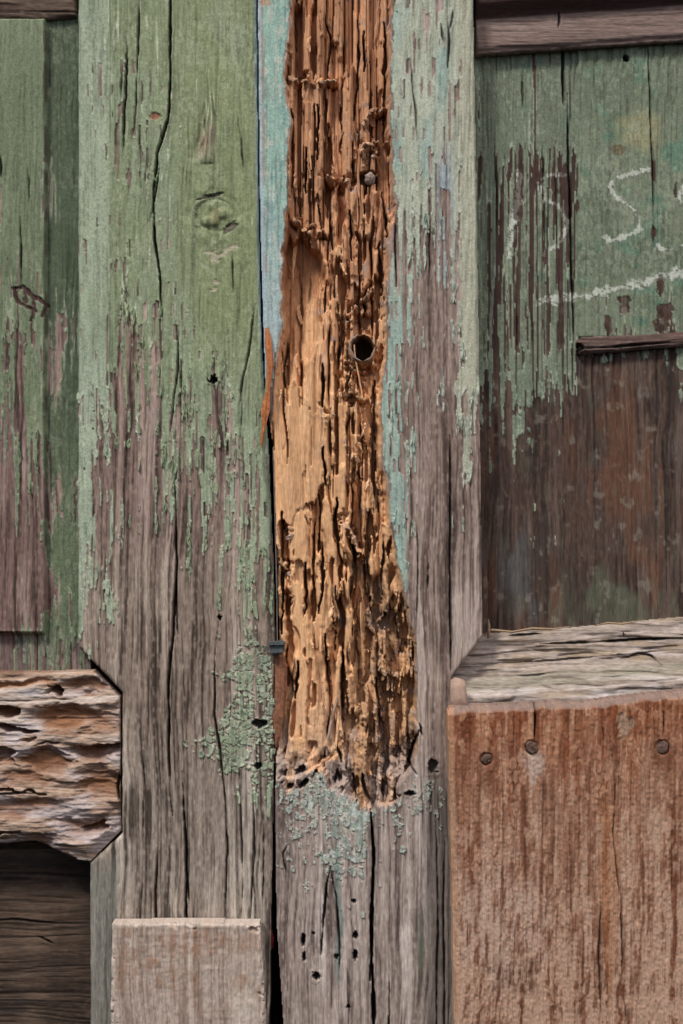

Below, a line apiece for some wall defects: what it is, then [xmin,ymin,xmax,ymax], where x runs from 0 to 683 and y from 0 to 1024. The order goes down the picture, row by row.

crack [152,0,172,315]
peeling [0,0,447,930]
peeling [386,0,482,589]
peeling [604,295,632,336]
peeling [652,274,675,334]
crack [182,798,190,918]